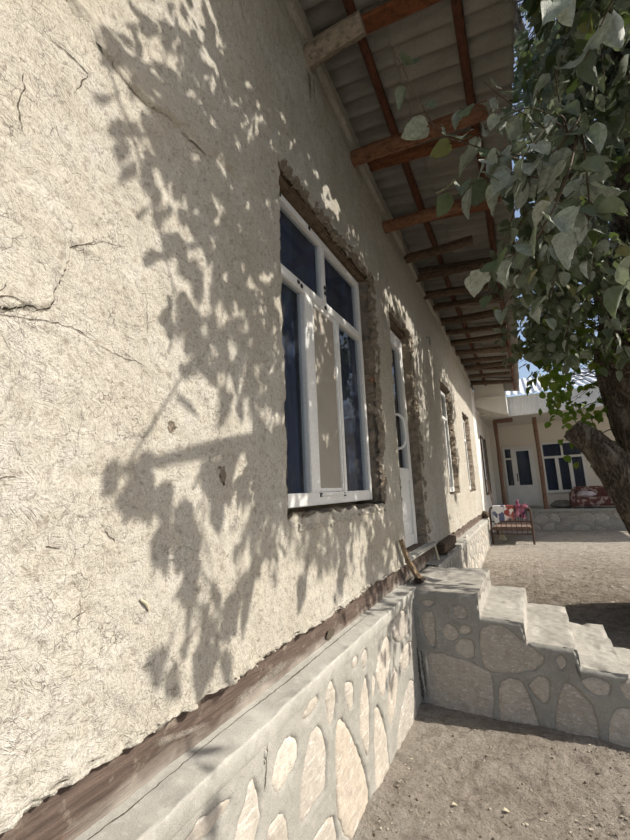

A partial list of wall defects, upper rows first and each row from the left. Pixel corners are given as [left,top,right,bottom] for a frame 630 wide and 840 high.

crack [50,38,88,89]
crack [0,241,145,366]